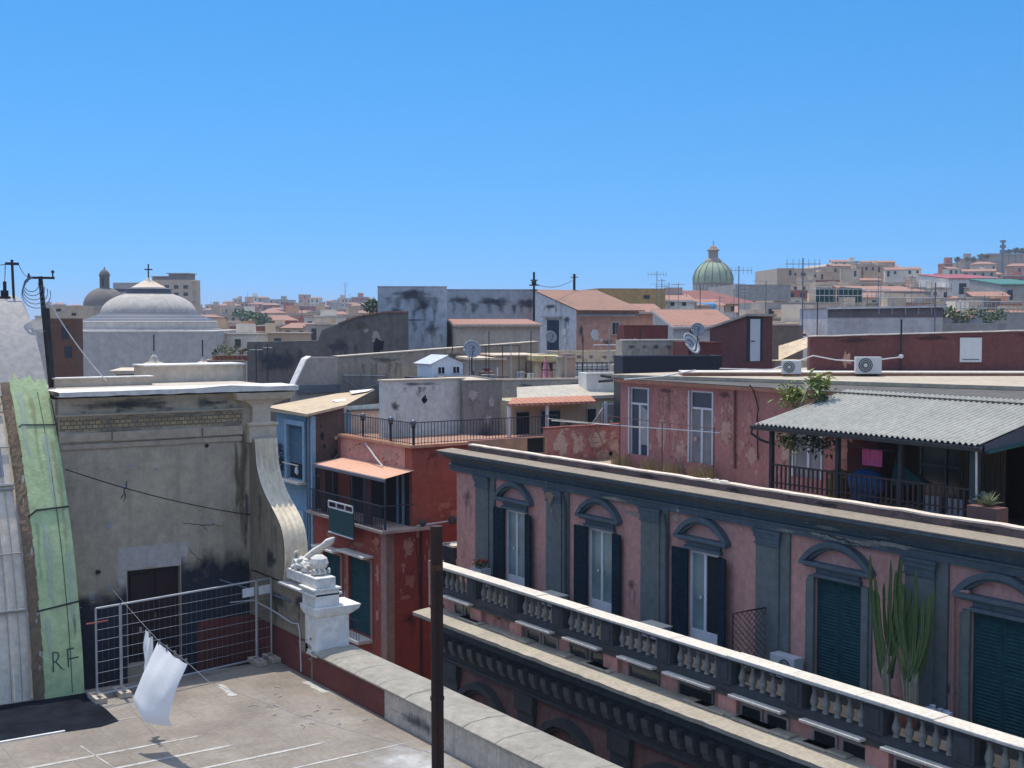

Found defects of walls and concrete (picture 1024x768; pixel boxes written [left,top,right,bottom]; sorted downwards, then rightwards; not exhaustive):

leakage [401,290,428,321]
leakage [89,400,162,409]
peeling [468,420,619,460]
flaking render [713,397,763,476]
flaking render [398,531,430,602]